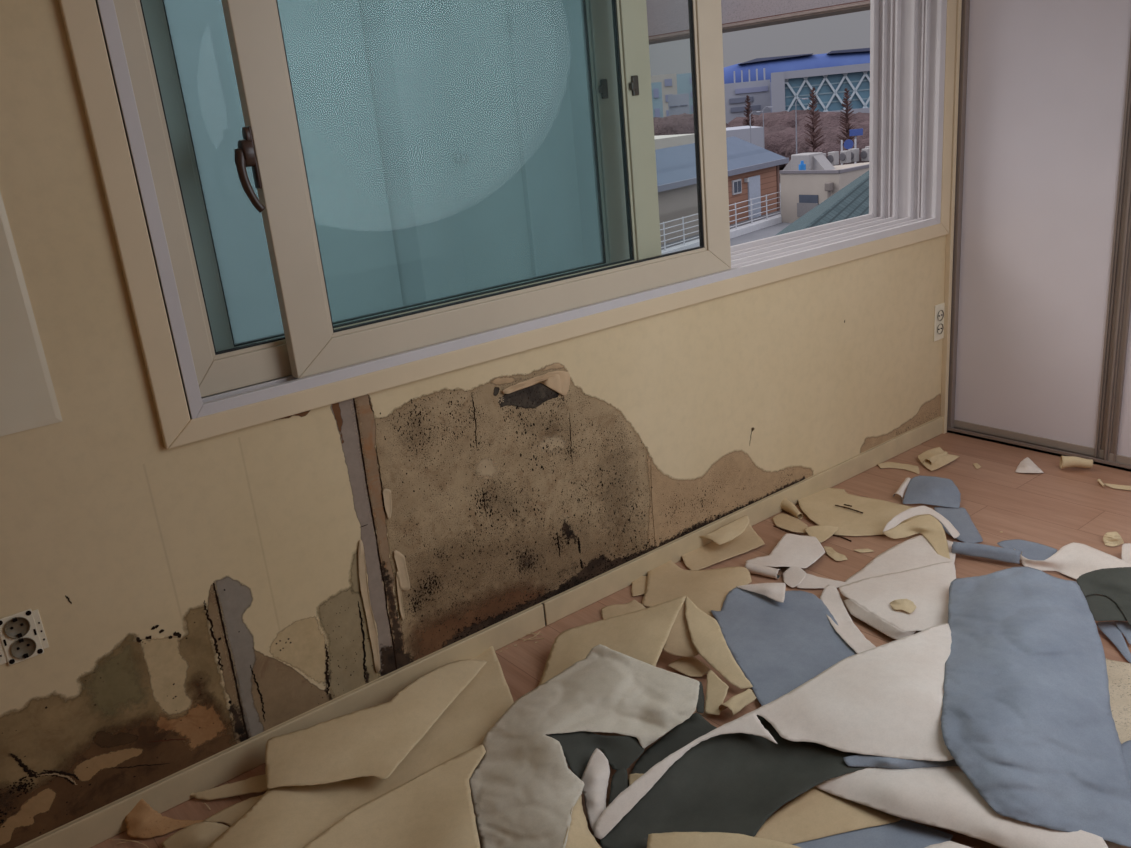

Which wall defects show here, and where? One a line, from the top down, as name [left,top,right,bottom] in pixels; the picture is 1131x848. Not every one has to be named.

spalling [493,371,570,409]
peeling [155,576,264,751]
peeling [330,394,404,677]
leakage [0,367,813,848]